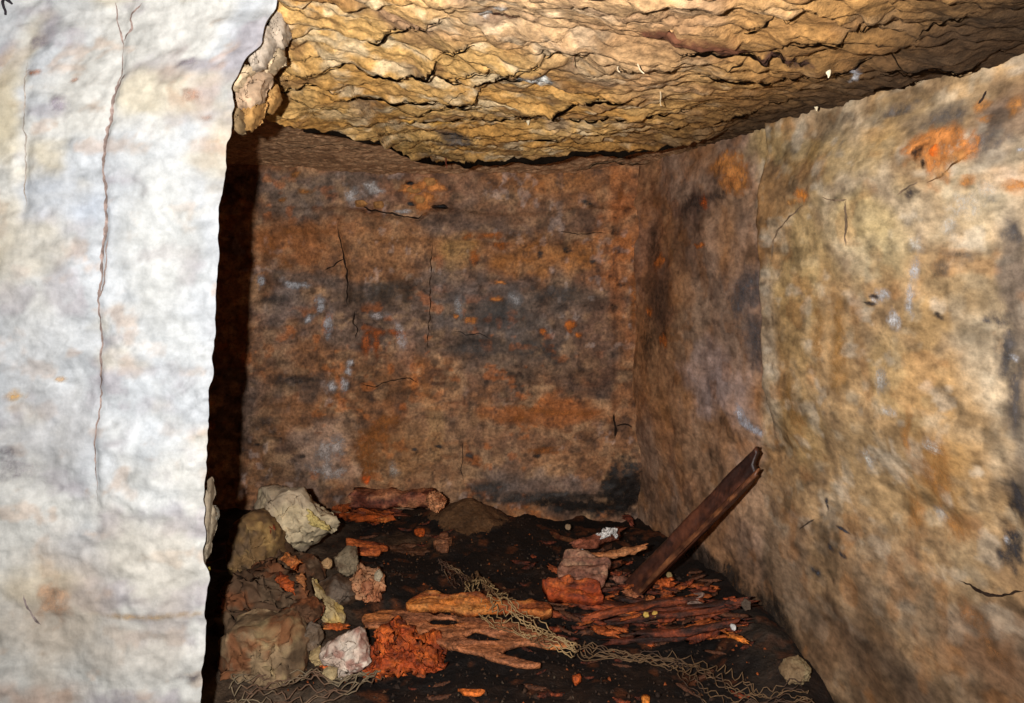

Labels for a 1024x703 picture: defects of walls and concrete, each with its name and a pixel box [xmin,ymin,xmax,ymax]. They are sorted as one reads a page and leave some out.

corrosion [903,127,980,177]
crack [94,3,141,496]
crack [326,223,358,339]
crack [364,204,448,346]
crack [771,197,848,255]
crack [958,580,1022,597]